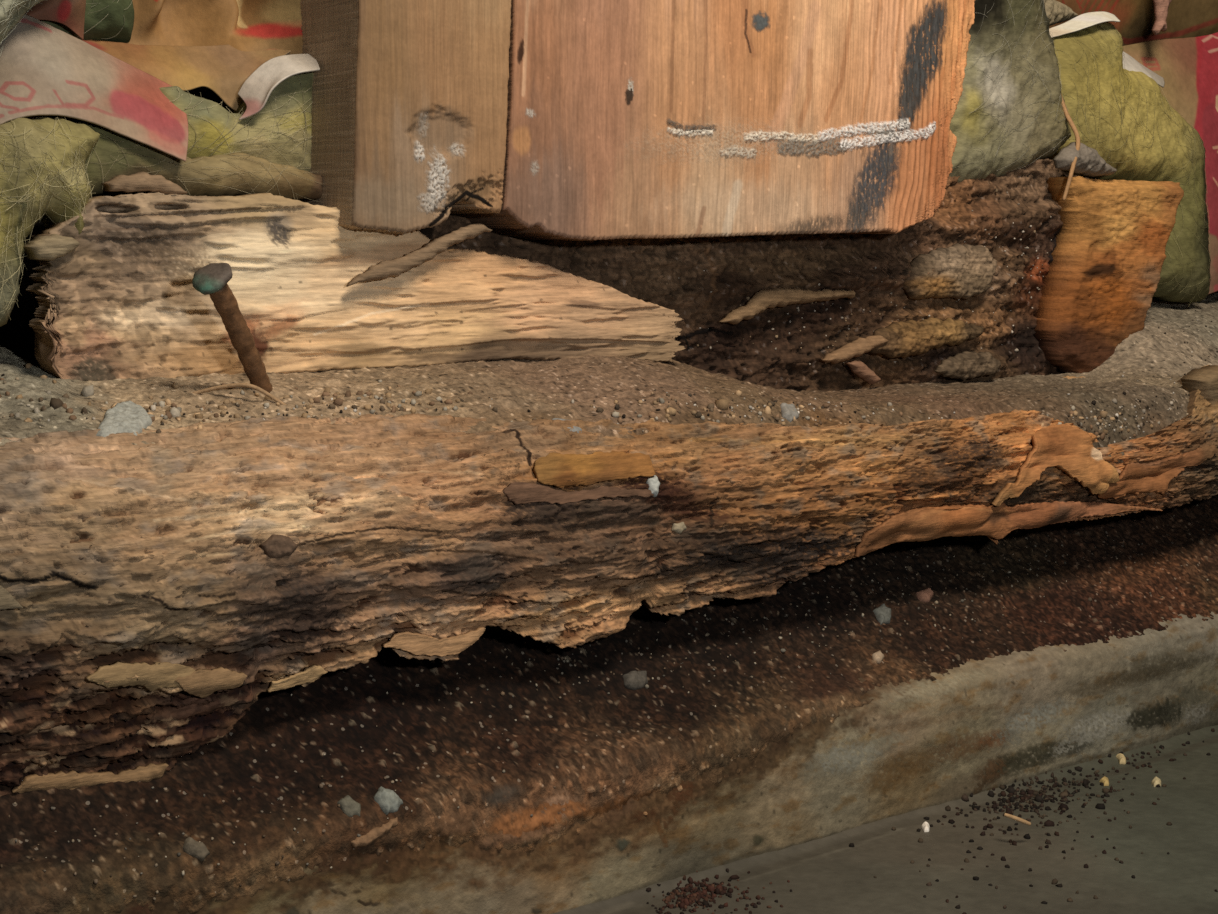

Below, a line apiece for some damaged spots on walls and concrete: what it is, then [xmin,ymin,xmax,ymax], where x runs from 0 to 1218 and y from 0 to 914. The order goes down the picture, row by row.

peeling [0,585,23,610]
peeling [382,627,486,657]
peeling [86,661,247,698]
peeling [267,664,328,692]
water stain [974,698,1205,794]